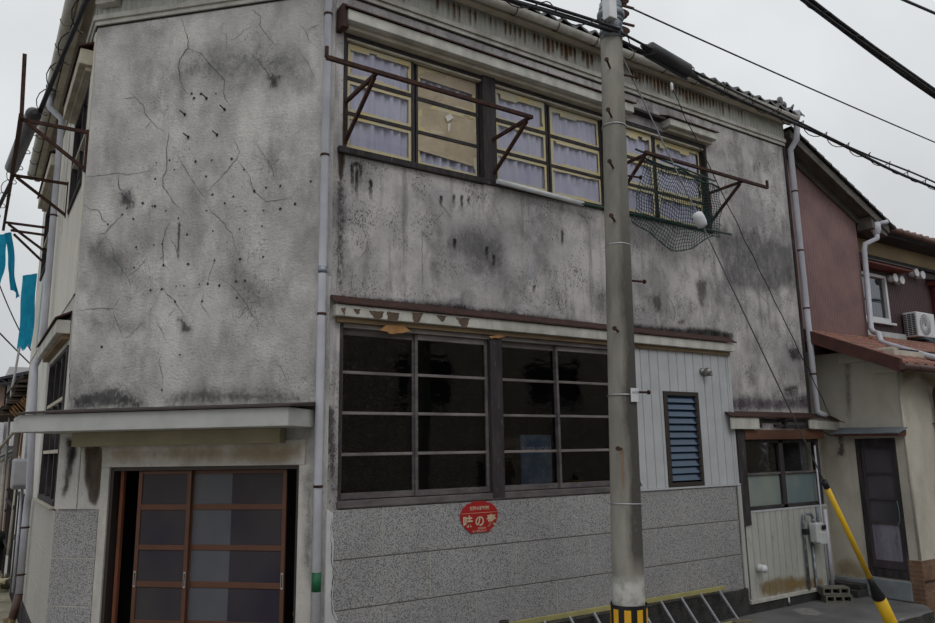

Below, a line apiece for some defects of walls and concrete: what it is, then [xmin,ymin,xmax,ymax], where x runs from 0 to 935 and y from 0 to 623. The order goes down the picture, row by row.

crack [178,14,276,103]
rust [490,16,593,67]
crack [82,96,293,385]
leakage [337,162,373,283]
peeling [341,308,423,334]
leakage [634,321,733,339]
leakage [733,385,808,410]